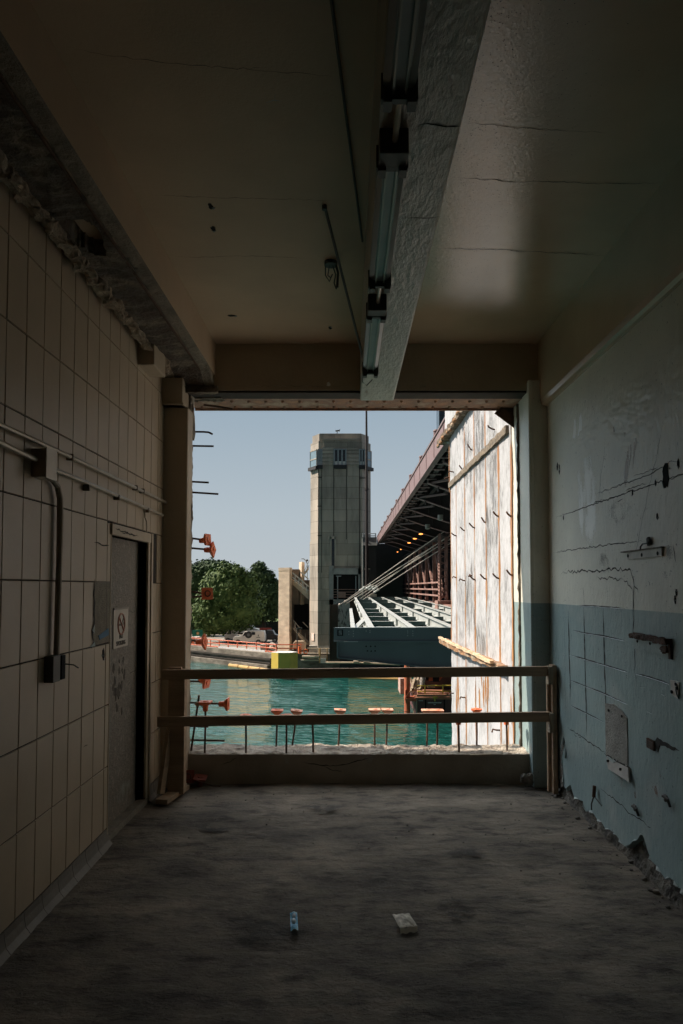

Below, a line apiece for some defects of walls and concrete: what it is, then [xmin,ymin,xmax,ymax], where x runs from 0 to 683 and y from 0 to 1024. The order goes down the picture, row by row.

corrosion [449,411,514,745]
crack [560,435,683,695]
spalling [551,785,683,914]